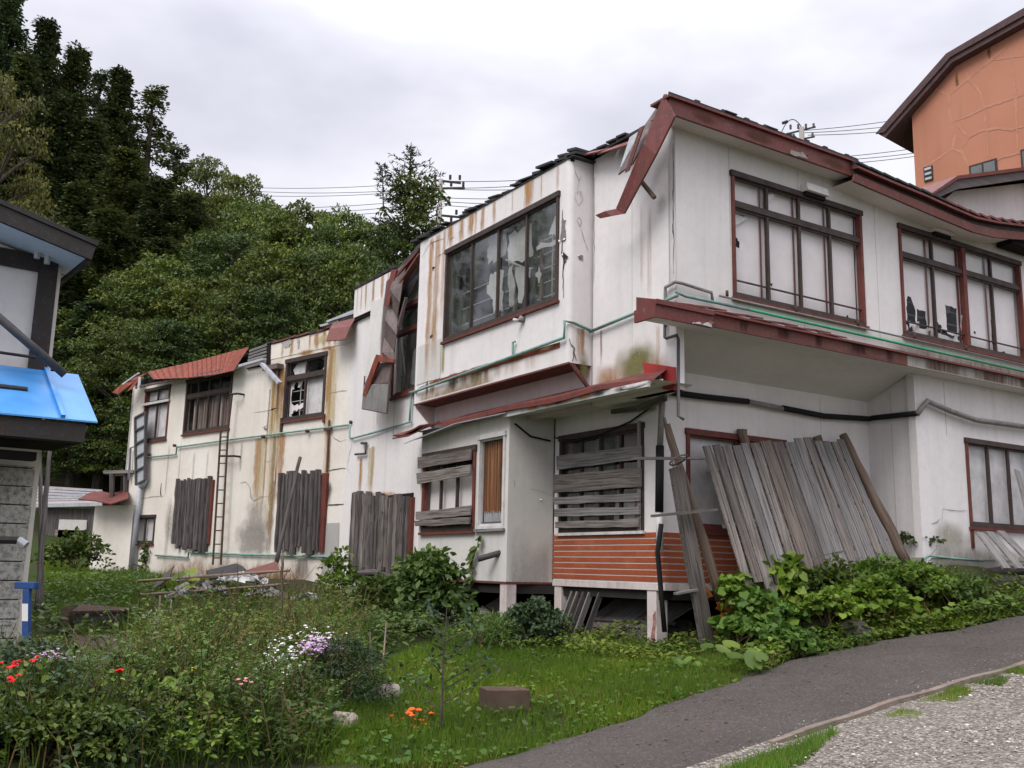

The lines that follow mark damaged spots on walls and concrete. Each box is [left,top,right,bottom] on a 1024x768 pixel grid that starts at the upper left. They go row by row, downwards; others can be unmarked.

crack [918,32,1024,170]
corrosion [426,208,494,337]
crack [561,166,595,298]
corrosion [282,331,336,441]
corrosion [254,368,285,543]
leakage [240,507,264,553]